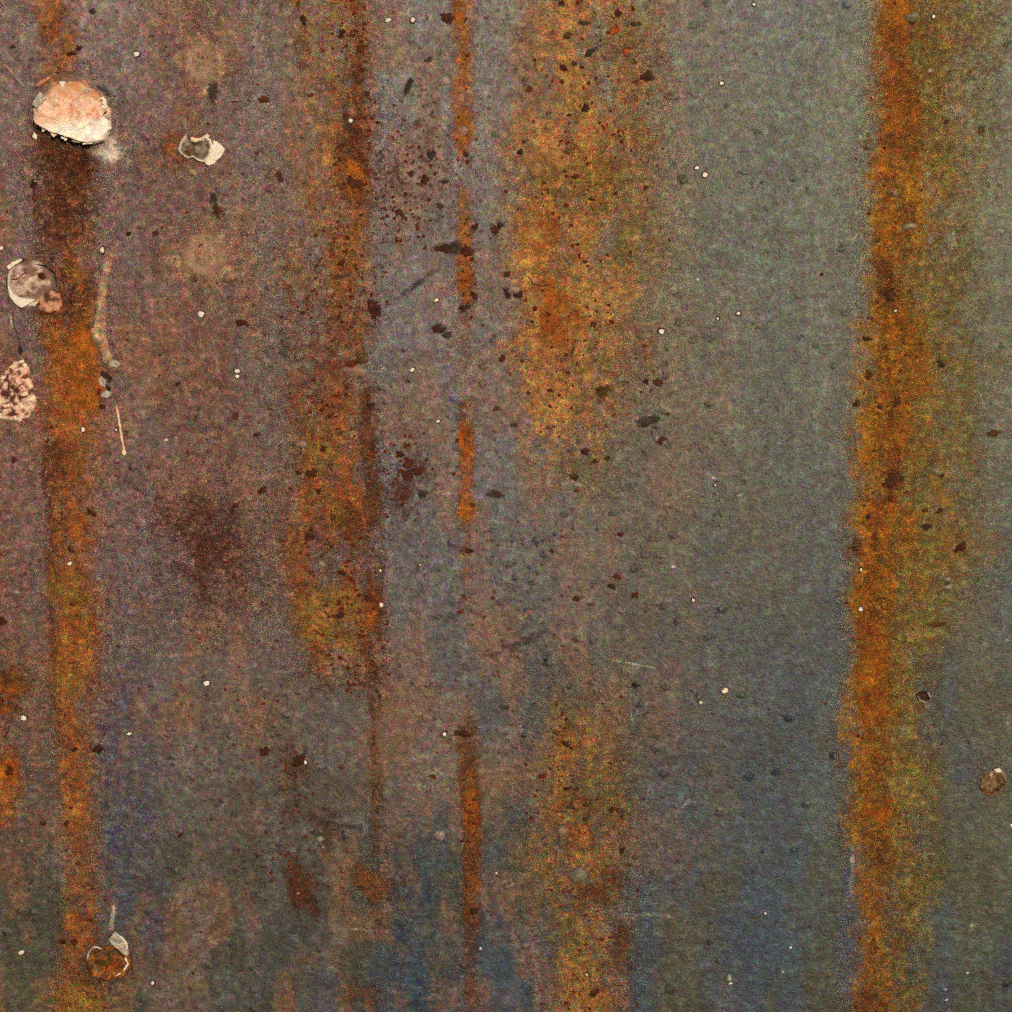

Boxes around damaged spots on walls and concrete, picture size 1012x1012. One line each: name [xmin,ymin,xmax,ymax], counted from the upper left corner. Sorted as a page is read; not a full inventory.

peeling [0,360,37,423]
corrosion [33,0,81,88]
corrosion [0,136,119,1012]
peeling [160,133,225,165]
corrosion [153,276,275,615]
corrosion [270,0,484,853]
corrosion [497,0,675,474]
corrosion [838,0,1002,1012]
corrosion [458,721,483,1012]
corrosion [520,690,640,1012]